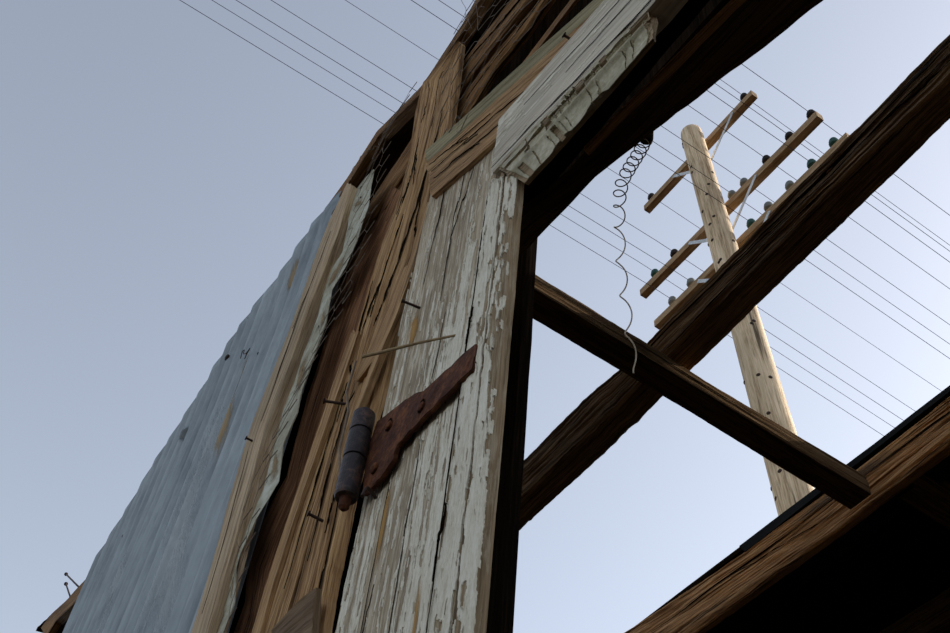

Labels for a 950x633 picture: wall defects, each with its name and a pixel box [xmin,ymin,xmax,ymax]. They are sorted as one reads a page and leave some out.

crack [284,361,355,589]
crack [360,423,424,633]
crack [426,382,461,633]
peeling [335,0,649,633]
crack [358,0,651,384]
crack [631,39,950,413]